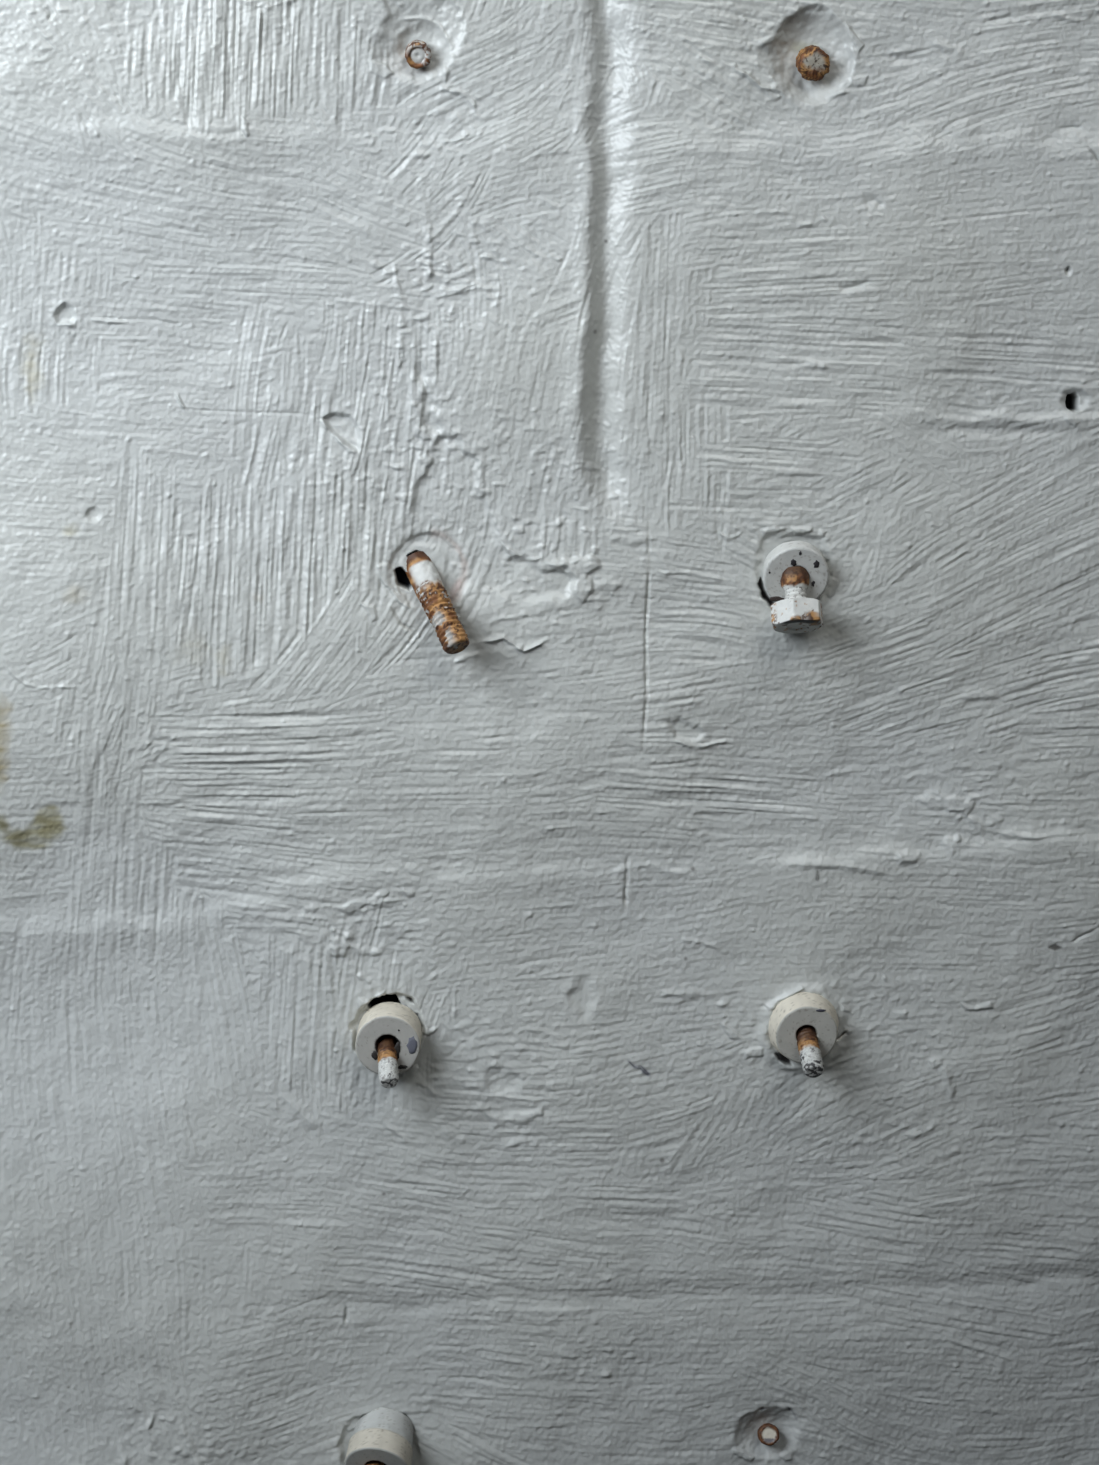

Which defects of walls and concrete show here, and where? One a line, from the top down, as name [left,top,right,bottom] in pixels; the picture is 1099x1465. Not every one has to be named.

leakage [0,803,70,853]